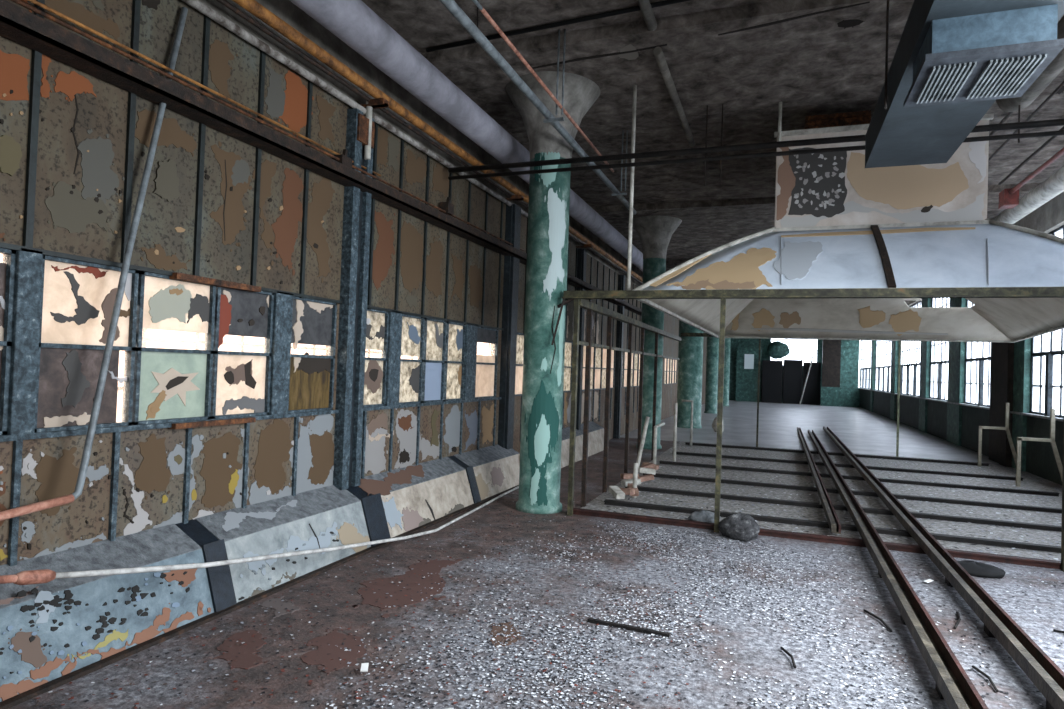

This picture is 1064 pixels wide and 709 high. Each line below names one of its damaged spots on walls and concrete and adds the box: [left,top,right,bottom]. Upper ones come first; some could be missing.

corrosion [0,50,97,101]
peeling [780,141,987,228]
peeling [50,265,232,348]
peeling [524,152,599,506]
peeling [21,449,38,479]
peeling [86,435,215,536]
peeling [230,414,334,510]
peeling [19,521,37,544]
peeling [19,532,107,560]
peeling [0,571,190,674]
peeling [311,520,928,709]